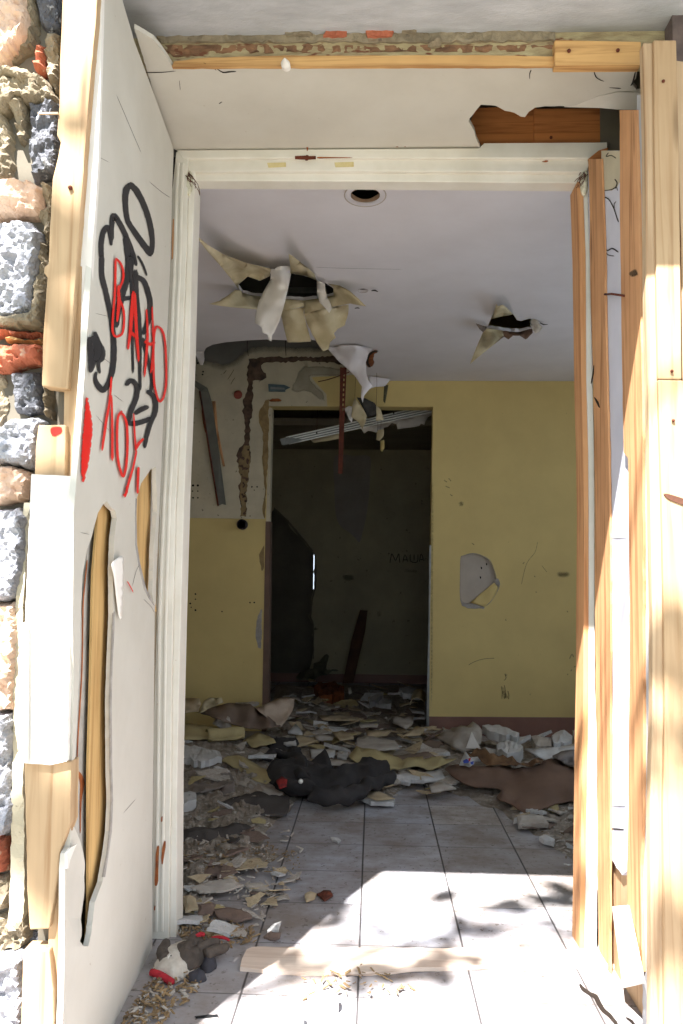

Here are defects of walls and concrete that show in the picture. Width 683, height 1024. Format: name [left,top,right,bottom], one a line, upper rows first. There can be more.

spalling [460,553,500,609]
spalling [102,556,124,877]
spalling [65,844,77,869]